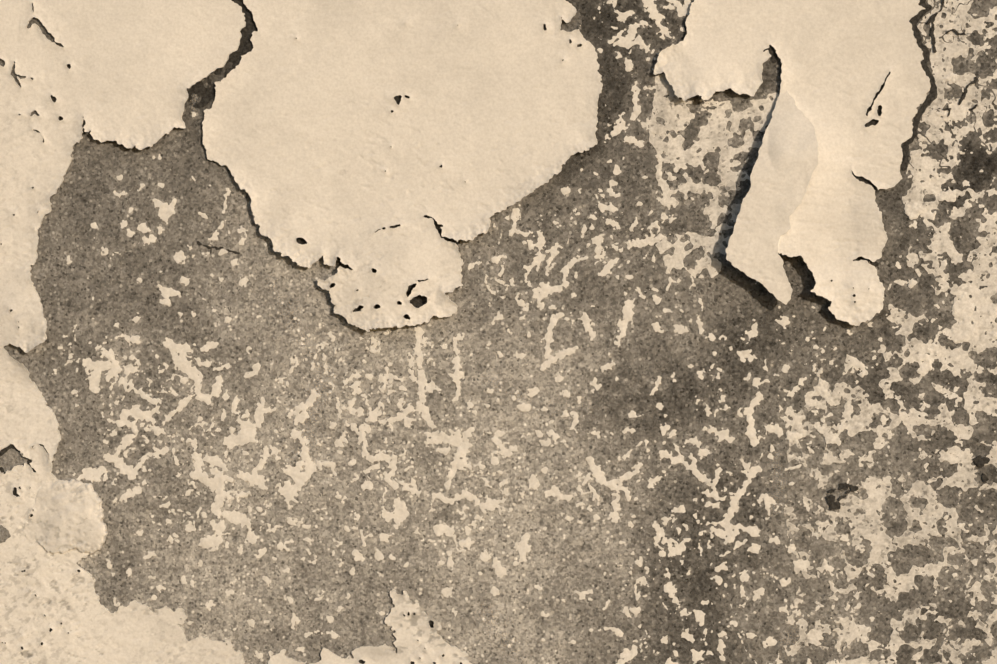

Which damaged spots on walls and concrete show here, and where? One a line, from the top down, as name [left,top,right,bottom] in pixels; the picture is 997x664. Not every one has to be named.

crack [188,0,258,108]
crack [901,0,978,171]